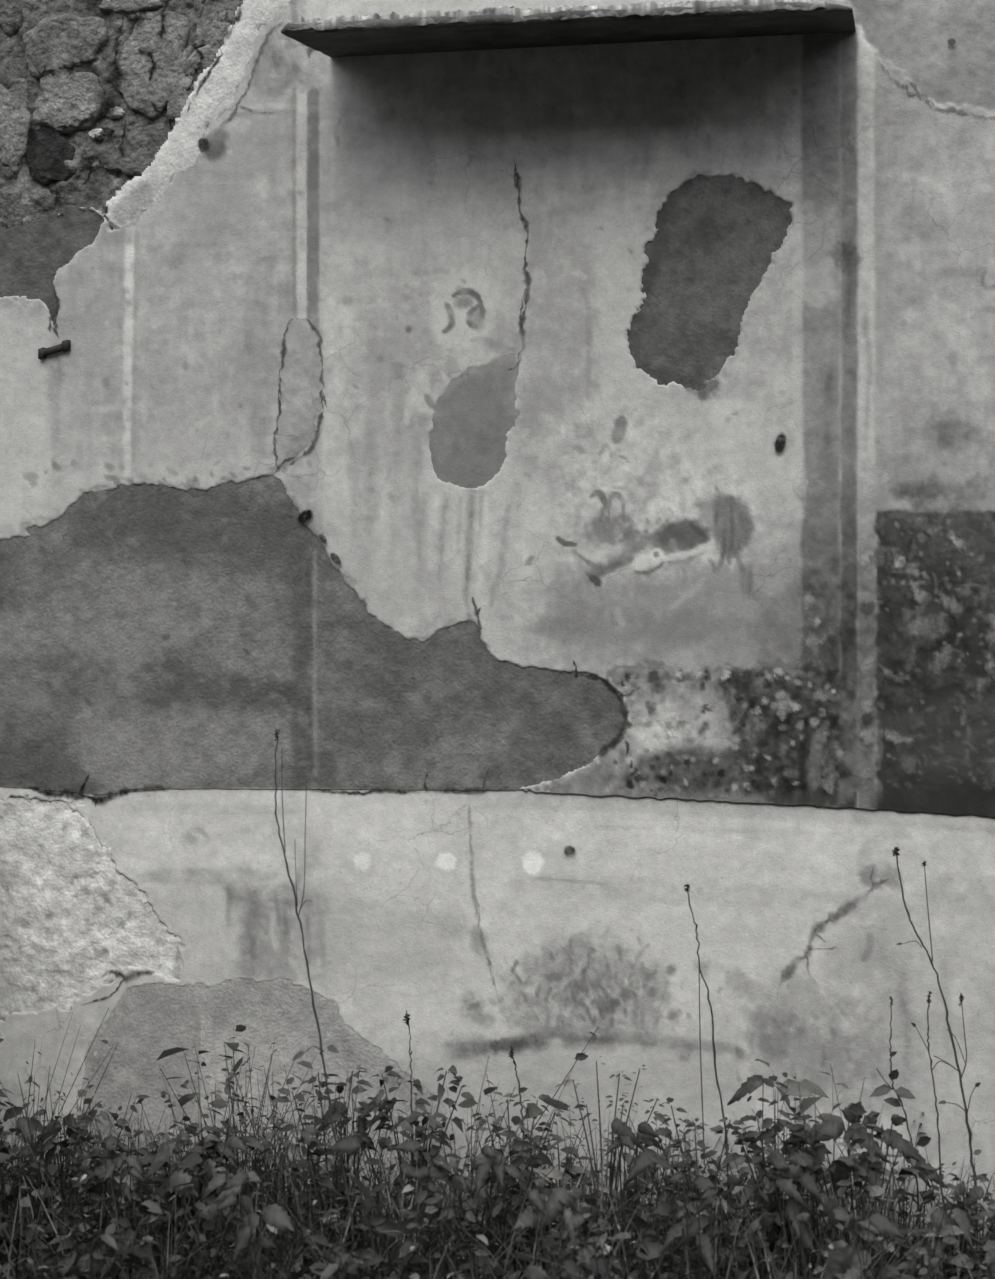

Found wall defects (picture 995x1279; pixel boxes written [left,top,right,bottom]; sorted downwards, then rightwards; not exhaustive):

flaking render [0,0,243,229]
crack [895,80,995,119]
crack [509,163,531,370]
crack [273,318,326,472]
crack [30,775,170,807]
crack [309,771,499,795]